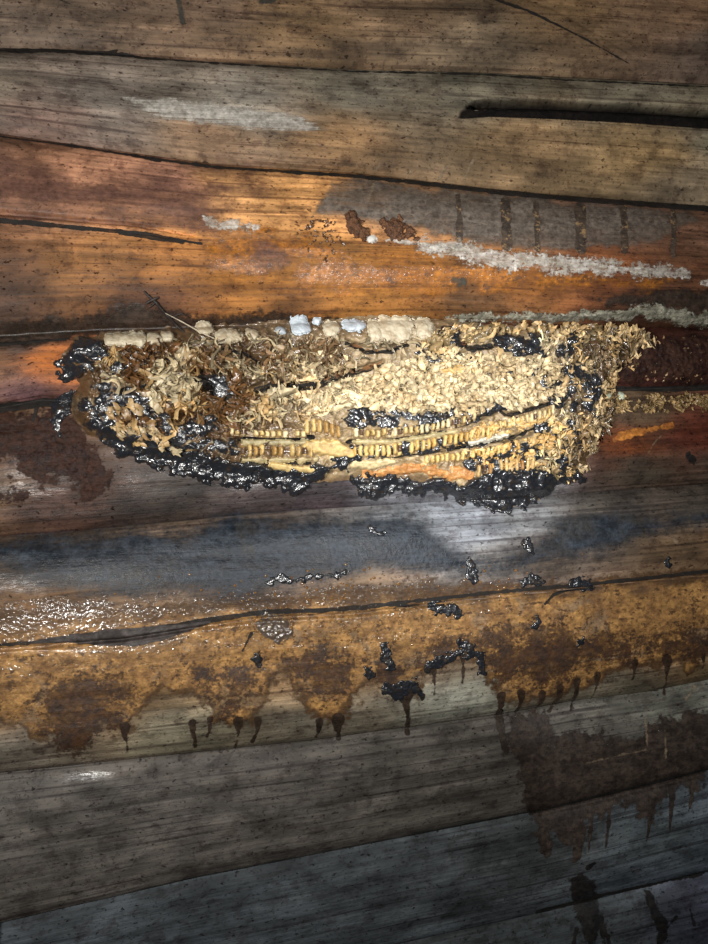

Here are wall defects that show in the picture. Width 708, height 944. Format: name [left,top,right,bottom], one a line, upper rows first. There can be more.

crack [0,0,708,87]
crack [459,101,708,129]
crack [0,218,202,245]
water stain [0,165,708,329]
water stain [0,303,292,348]
water stain [0,569,708,944]